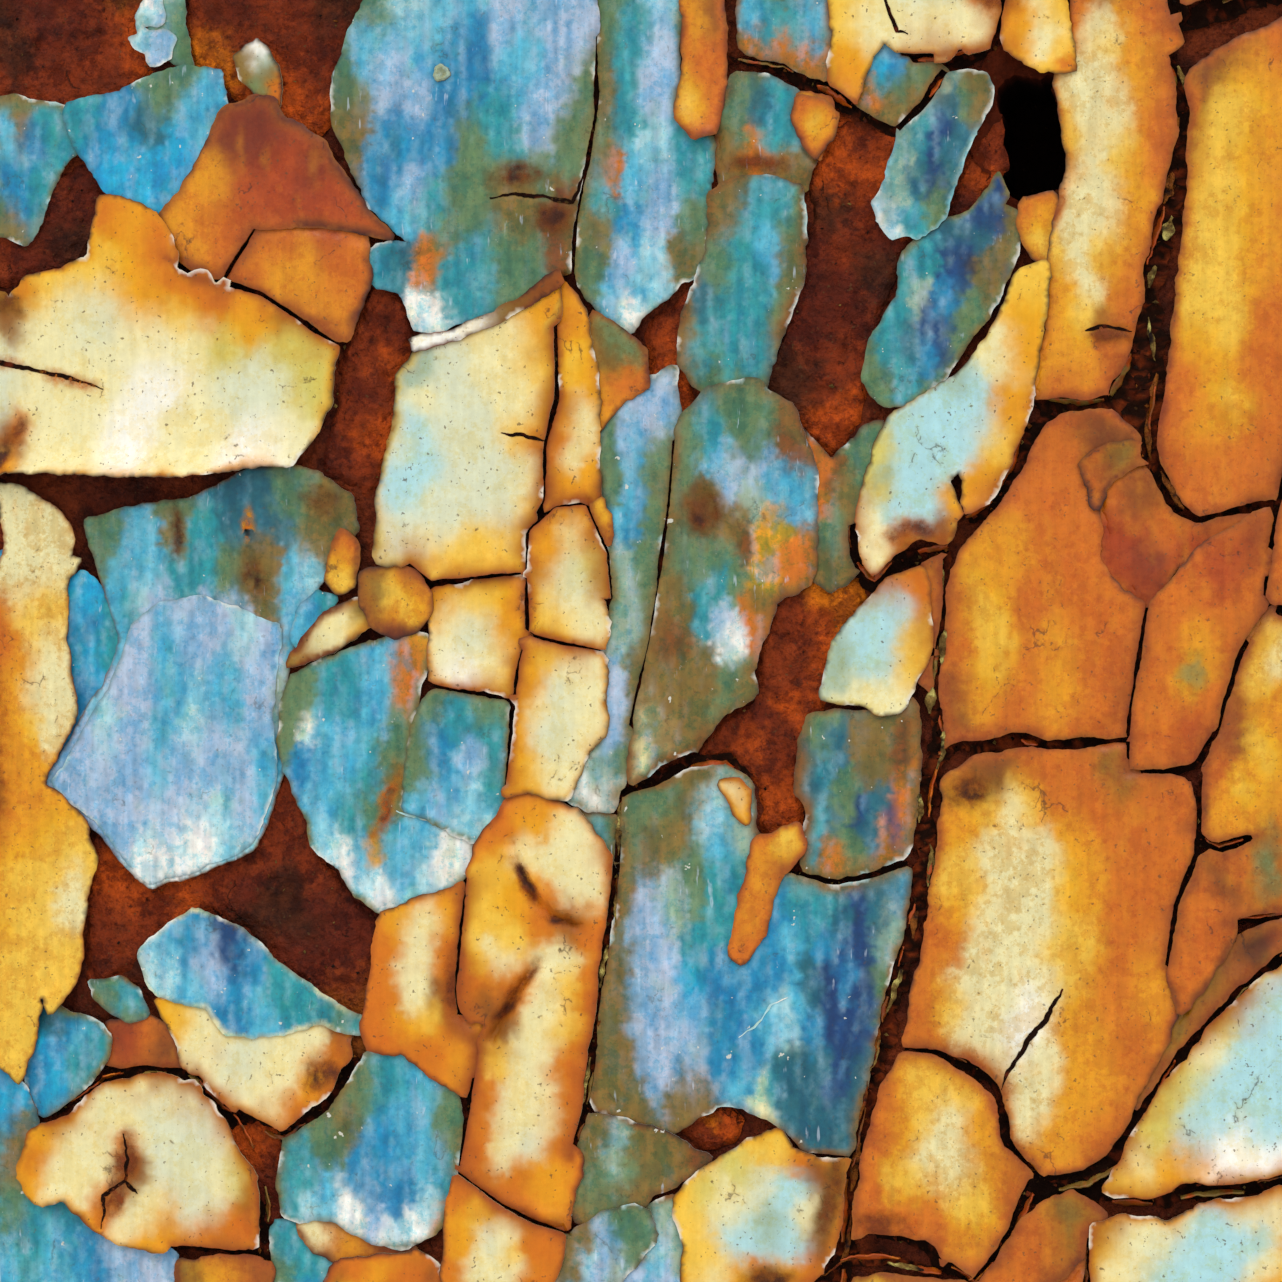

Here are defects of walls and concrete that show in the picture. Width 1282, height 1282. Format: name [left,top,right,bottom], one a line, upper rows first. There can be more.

crack [0,360,103,390]
rust [85,774,377,1015]
rust [186,0,362,137]
peeling [0,0,612,1282]
rust [323,285,414,498]
peeling [555,553,948,1282]
rust [768,109,914,456]
crack [729,0,1005,137]
peeling [567,0,1185,867]
crack [789,523,1282,1282]
peeling [851,16,1282,1282]
crack [965,0,1282,614]